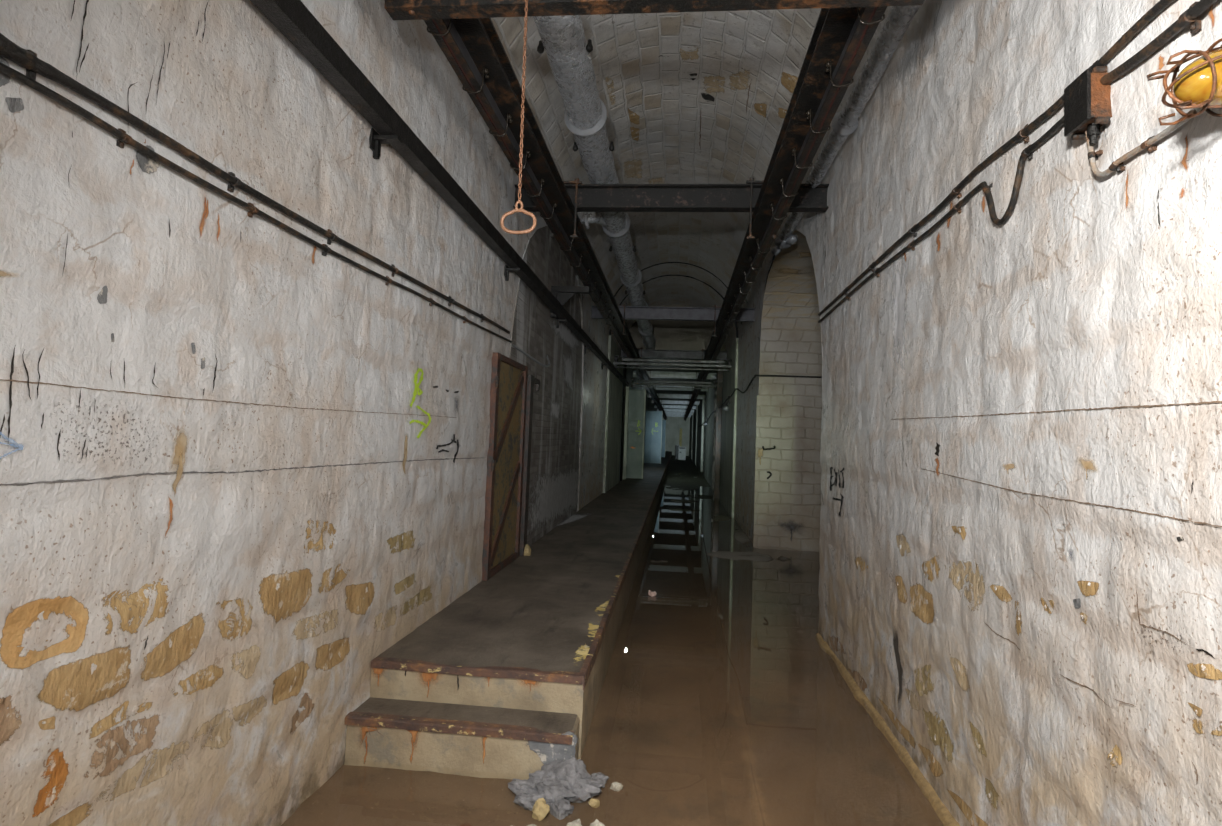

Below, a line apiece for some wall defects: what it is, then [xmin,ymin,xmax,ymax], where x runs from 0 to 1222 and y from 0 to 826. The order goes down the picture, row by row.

flaking render [304,519,336,553]
flaking render [387,530,416,554]
flaking render [896,534,911,556]
flaking render [952,526,966,540]
flaking render [895,555,1022,636]
flaking render [1073,580,1099,624]
flaking render [0,564,432,826]
flaking render [879,665,954,777]
flaking render [970,721,987,757]
flaking render [1188,702,1222,736]
flaking render [947,789,988,826]
flaking render [985,778,1003,809]